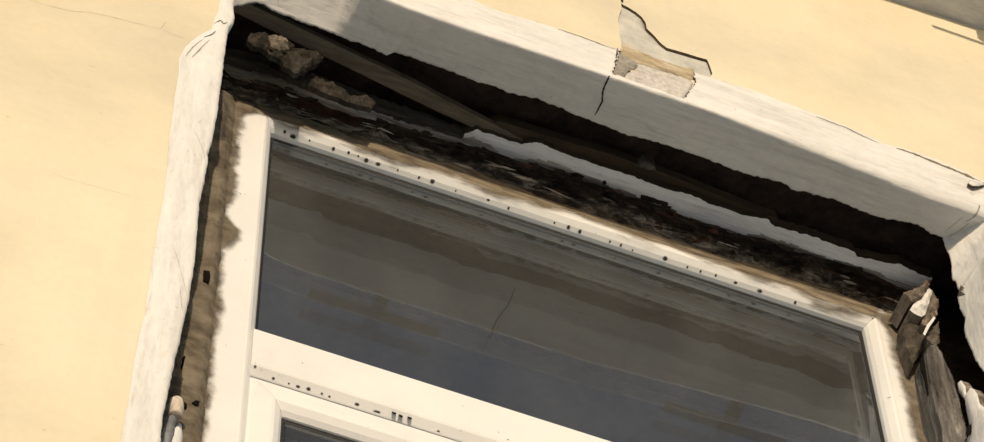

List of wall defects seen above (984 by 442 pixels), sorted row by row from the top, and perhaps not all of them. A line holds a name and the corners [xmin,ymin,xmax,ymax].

crack [594,48,618,116]
flaking render [559,7,711,98]
leakage [175,95,927,442]
flaking render [888,280,940,379]